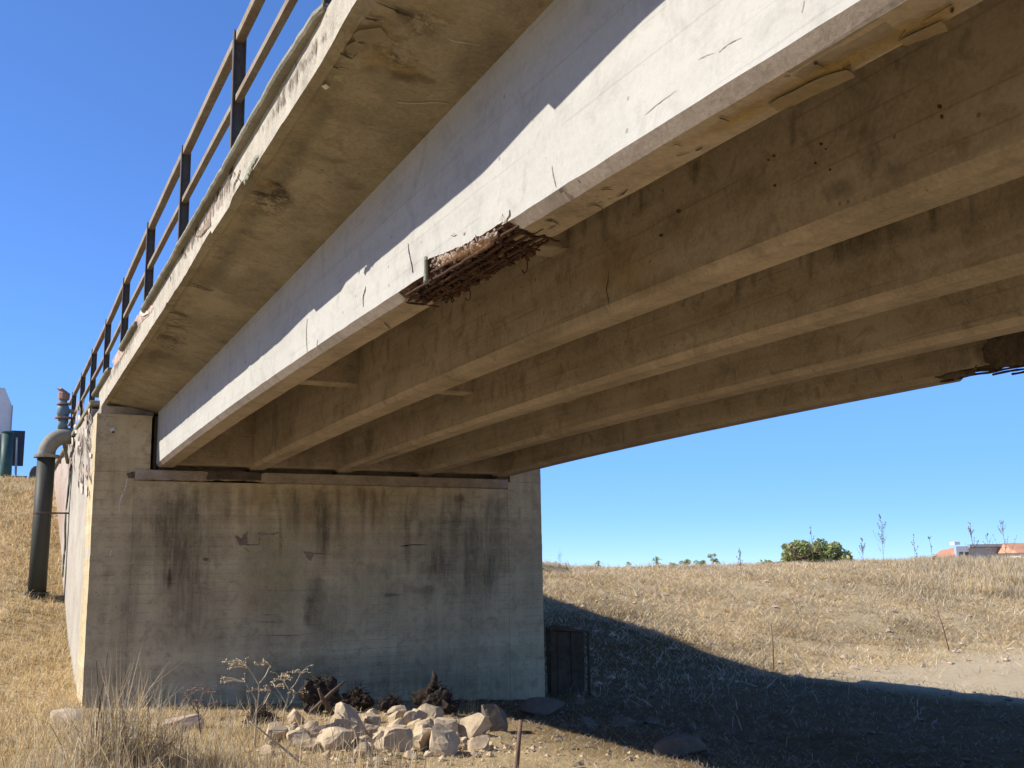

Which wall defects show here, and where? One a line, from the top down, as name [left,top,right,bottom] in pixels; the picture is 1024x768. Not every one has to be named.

spalling [405,210,560,307]
spalling [935,331,1024,383]